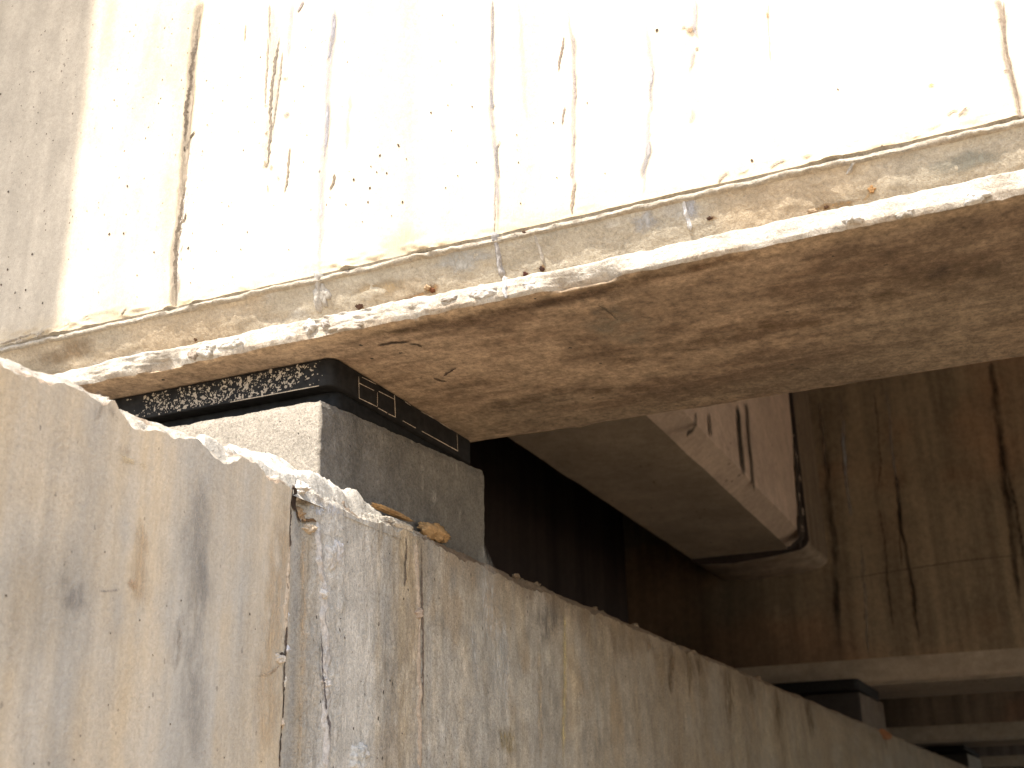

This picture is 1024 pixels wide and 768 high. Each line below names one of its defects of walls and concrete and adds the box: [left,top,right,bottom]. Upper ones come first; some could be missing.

water stain [558,23,576,214]
crack [262,486,293,767]
spalling [0,357,879,731]
water stain [998,425,1024,589]